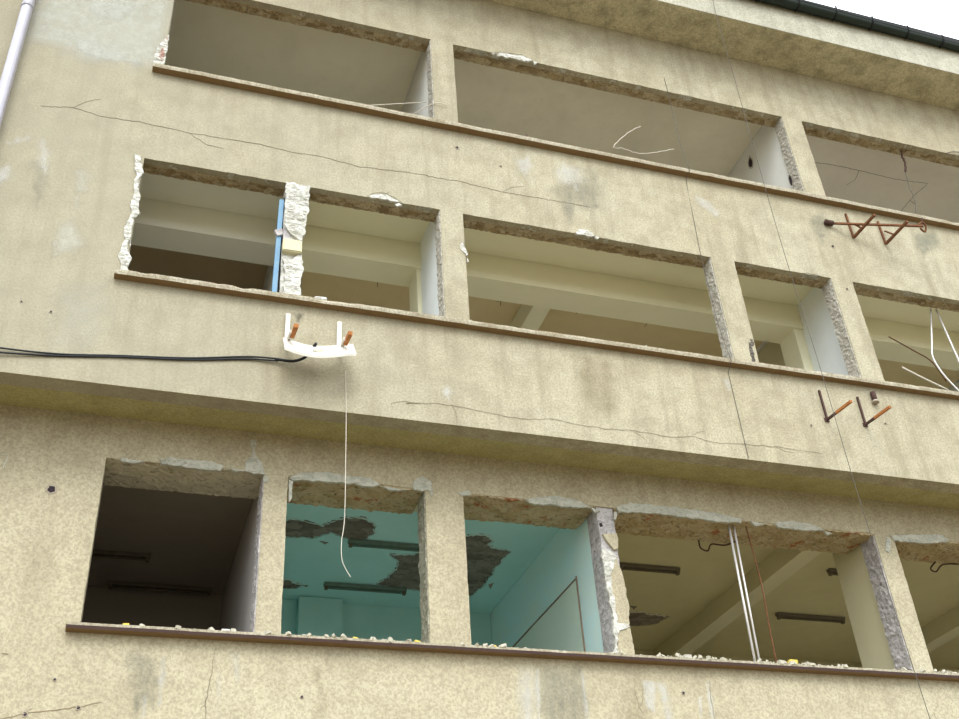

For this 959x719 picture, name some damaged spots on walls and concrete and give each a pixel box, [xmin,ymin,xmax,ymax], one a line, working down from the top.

crack [815,162,928,211]
spalling [118,154,144,270]
peeling [282,254,304,295]
peeling [285,516,377,544]
peeling [283,578,308,589]
peeling [376,552,420,591]
peeling [465,533,513,596]
peeling [601,548,616,561]